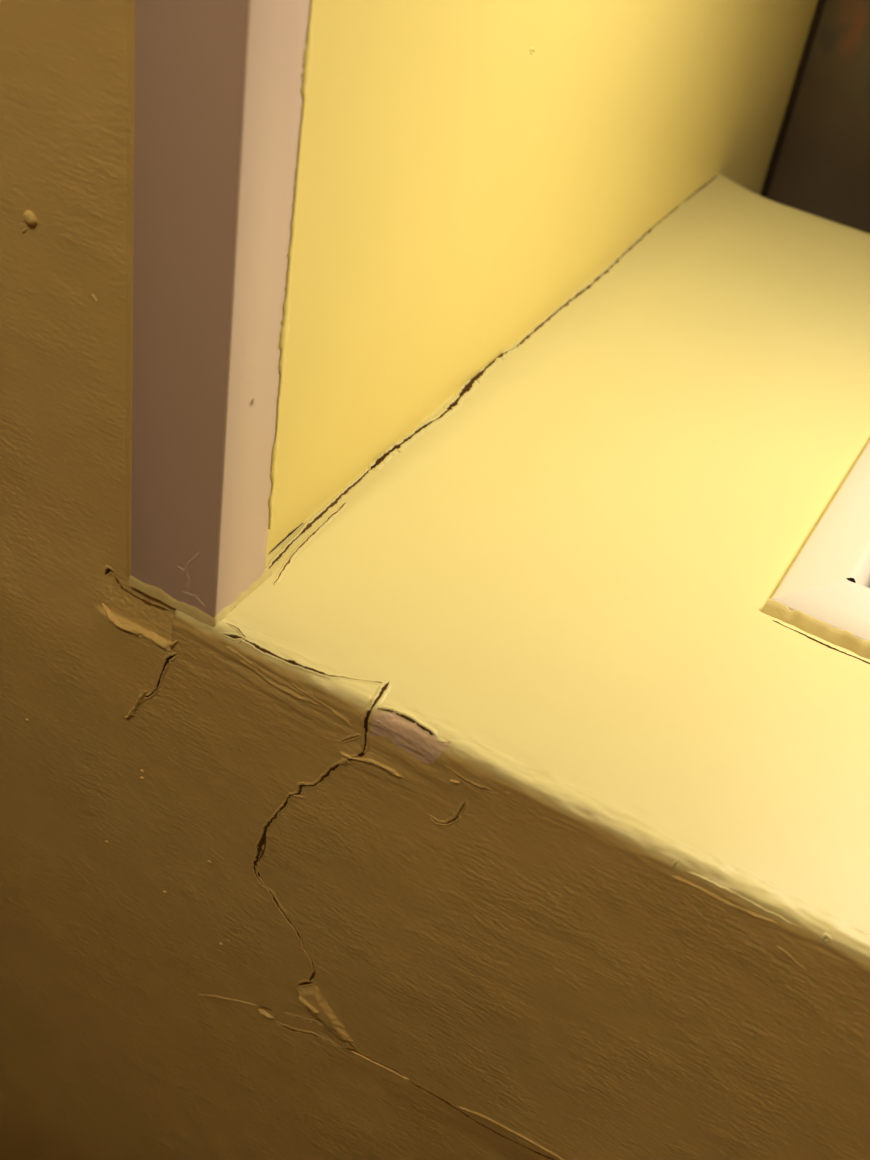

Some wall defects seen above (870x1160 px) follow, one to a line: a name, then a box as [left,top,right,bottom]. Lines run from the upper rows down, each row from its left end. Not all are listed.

crack [265,175,718,585]
flaking render [102,565,178,649]
crack [773,620,870,664]
crack [124,652,178,718]
crack [220,620,392,987]
peeling [333,752,402,777]
flaking render [370,705,513,795]
crack [427,779,468,826]
crack [198,994,257,1006]
crack [345,1048,564,1160]